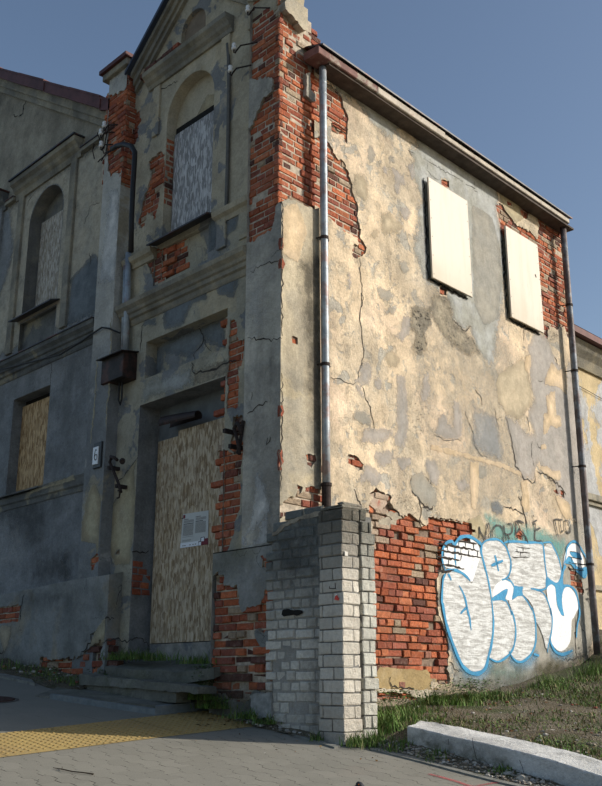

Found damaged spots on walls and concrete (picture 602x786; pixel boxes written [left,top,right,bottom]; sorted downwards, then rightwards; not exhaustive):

peeling [0,79,141,355]
flaking render [138,139,174,228]
flaking render [147,239,190,285]
crack [192,328,236,374]
crack [331,262,375,428]
flaking render [249,0,592,703]
flaking render [143,293,245,552]
crack [475,389,541,530]
flaking render [0,604,21,624]
flaking render [212,572,273,704]